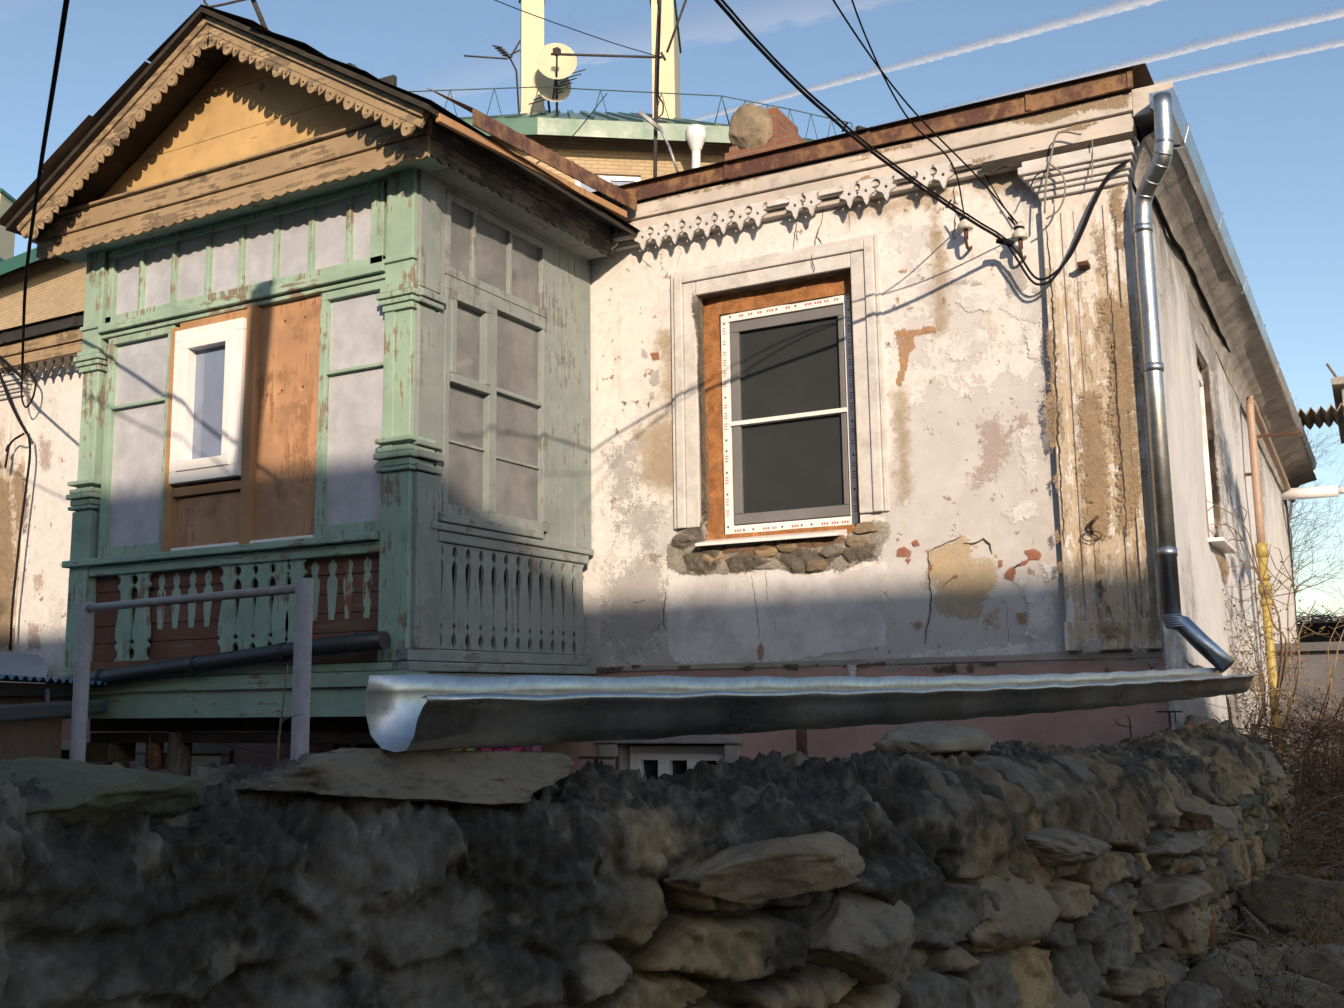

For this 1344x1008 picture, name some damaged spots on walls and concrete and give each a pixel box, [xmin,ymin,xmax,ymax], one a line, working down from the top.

rust [980,171,1026,189]
peeling [1091,216,1109,276]
peeling [1074,293,1149,543]
spalling [596,266,1063,674]
spalling [1078,580,1147,655]